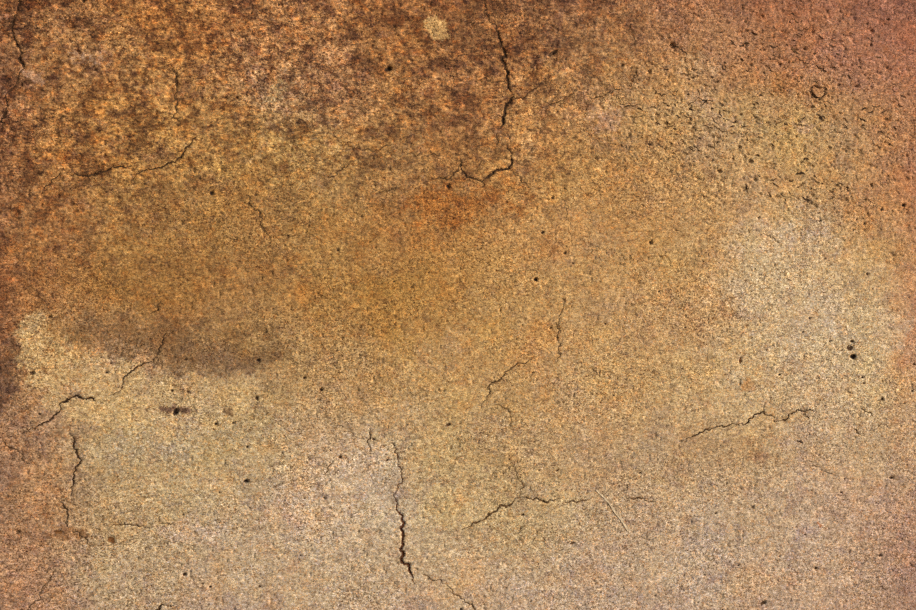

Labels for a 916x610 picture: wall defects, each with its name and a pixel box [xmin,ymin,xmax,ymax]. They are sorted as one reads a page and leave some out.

crack [0,0,25,132]
crack [407,0,641,188]
crack [324,136,386,178]
leakage [0,312,39,422]
crack [2,333,166,545]
leakage [48,302,308,384]
crack [686,402,816,441]
crack [367,428,476,610]
crack [464,464,587,529]